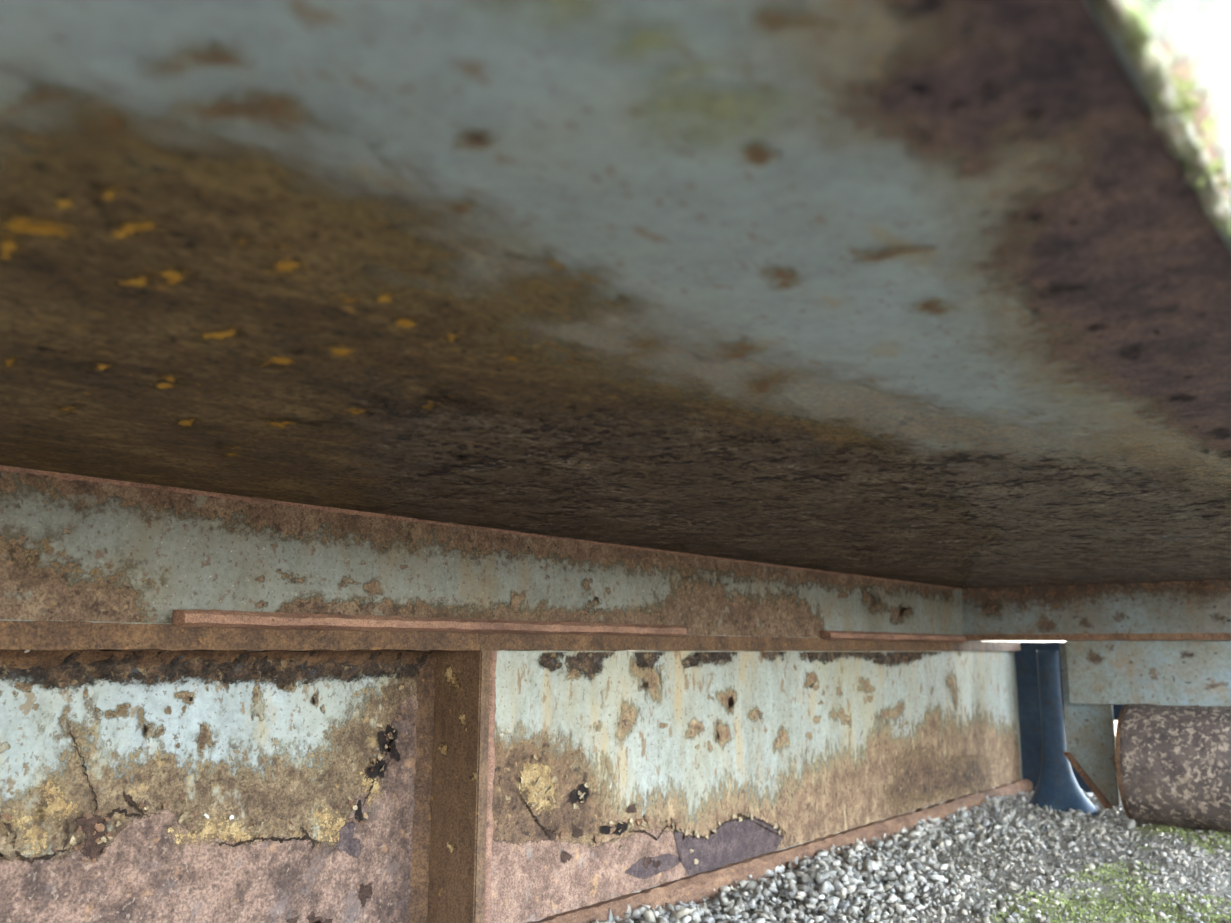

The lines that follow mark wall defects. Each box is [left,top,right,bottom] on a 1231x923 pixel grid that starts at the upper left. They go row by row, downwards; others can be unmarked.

corrosion [0,0,1231,637]
corrosion [0,652,429,738]
corrosion [444,665,459,689]
corrosion [1087,646,1113,663]
corrosion [60,706,84,764]
crack [0,723,148,864]
corrosion [198,722,213,752]
peeling [0,670,418,923]
crack [363,741,390,806]
corrosion [492,652,1021,879]
crack [212,827,326,852]
corrosion [336,822,361,858]